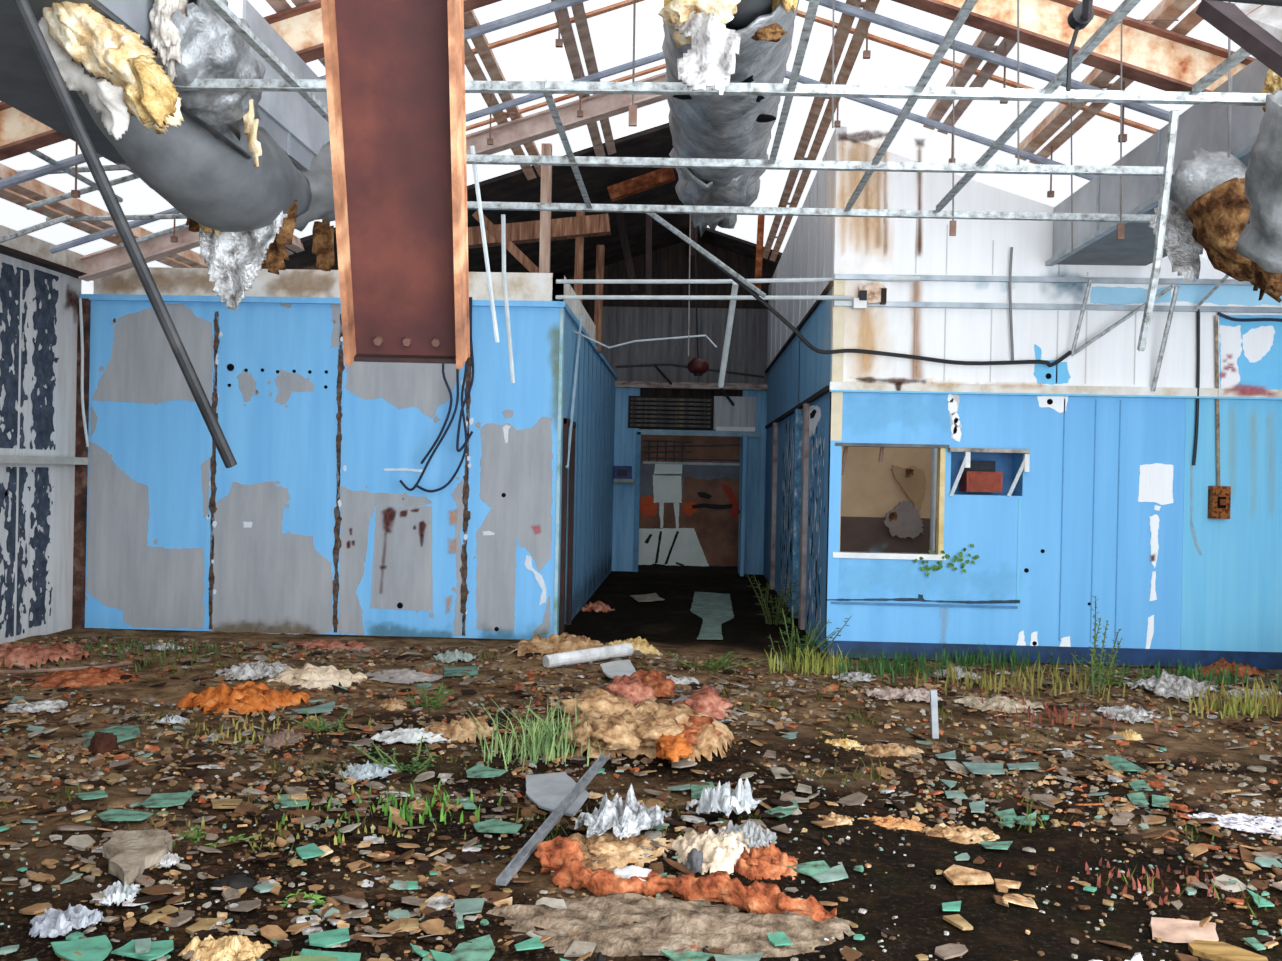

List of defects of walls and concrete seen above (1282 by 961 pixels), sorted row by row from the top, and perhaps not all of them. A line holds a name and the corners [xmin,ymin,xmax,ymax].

peeling [0,262,59,450]
peeling [1090,278,1282,390]
peeling [0,467,54,638]
peeling [85,303,553,636]
peeling [1138,463,1173,649]